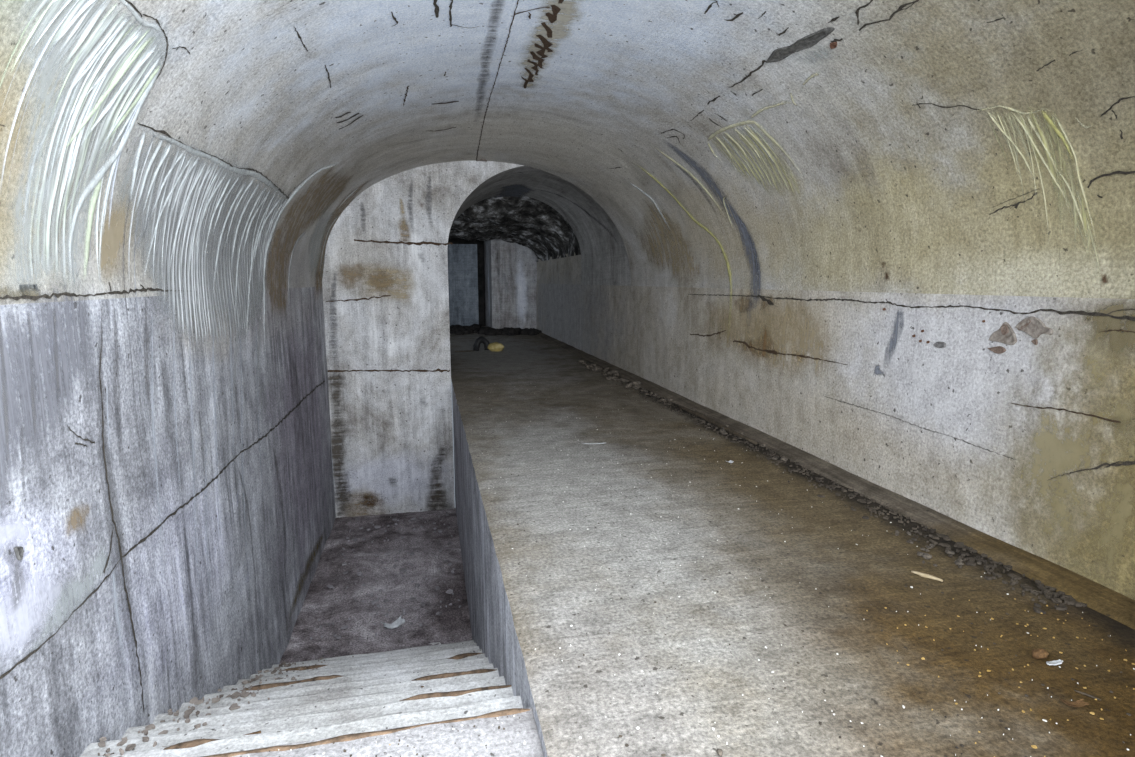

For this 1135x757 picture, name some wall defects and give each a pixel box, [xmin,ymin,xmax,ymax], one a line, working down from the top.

crack [828,0,919,31]
water stain [708,94,794,191]
water stain [979,106,1099,266]
crack [1087,171,1135,198]
corrosion [400,189,412,241]
water stain [661,145,760,302]
crack [0,282,197,301]
water stain [0,0,330,640]
corrosion [342,268,410,298]
crack [688,294,1135,321]
spalling [982,317,1053,354]
crack [0,345,450,710]